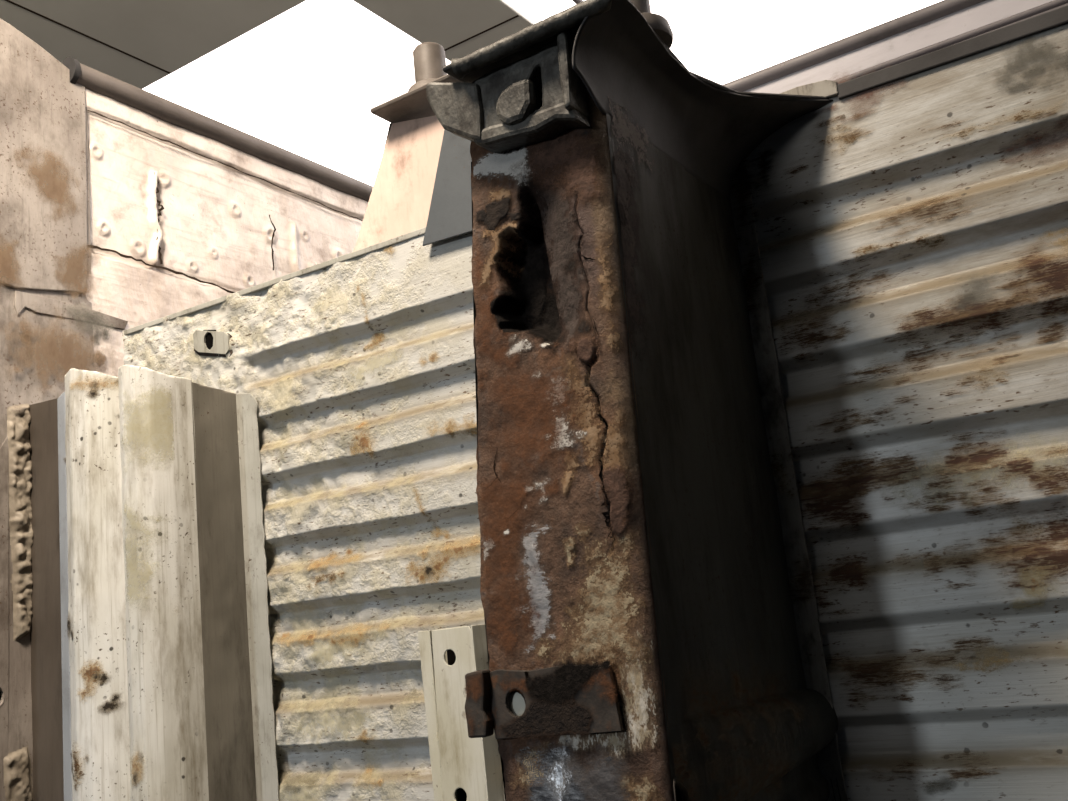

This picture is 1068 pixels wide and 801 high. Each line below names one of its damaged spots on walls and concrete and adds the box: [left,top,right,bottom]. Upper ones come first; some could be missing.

leakage [16,149,76,215]
rust [489,187,511,202]
rust [526,128,611,206]
peeling [489,296,534,333]
rust [774,196,971,367]
rust [845,234,1068,385]
crack [568,201,616,554]
rust [799,430,1068,589]
rust [80,662,109,699]
rust [826,637,991,710]
rust [71,749,83,787]
rust [131,756,142,784]